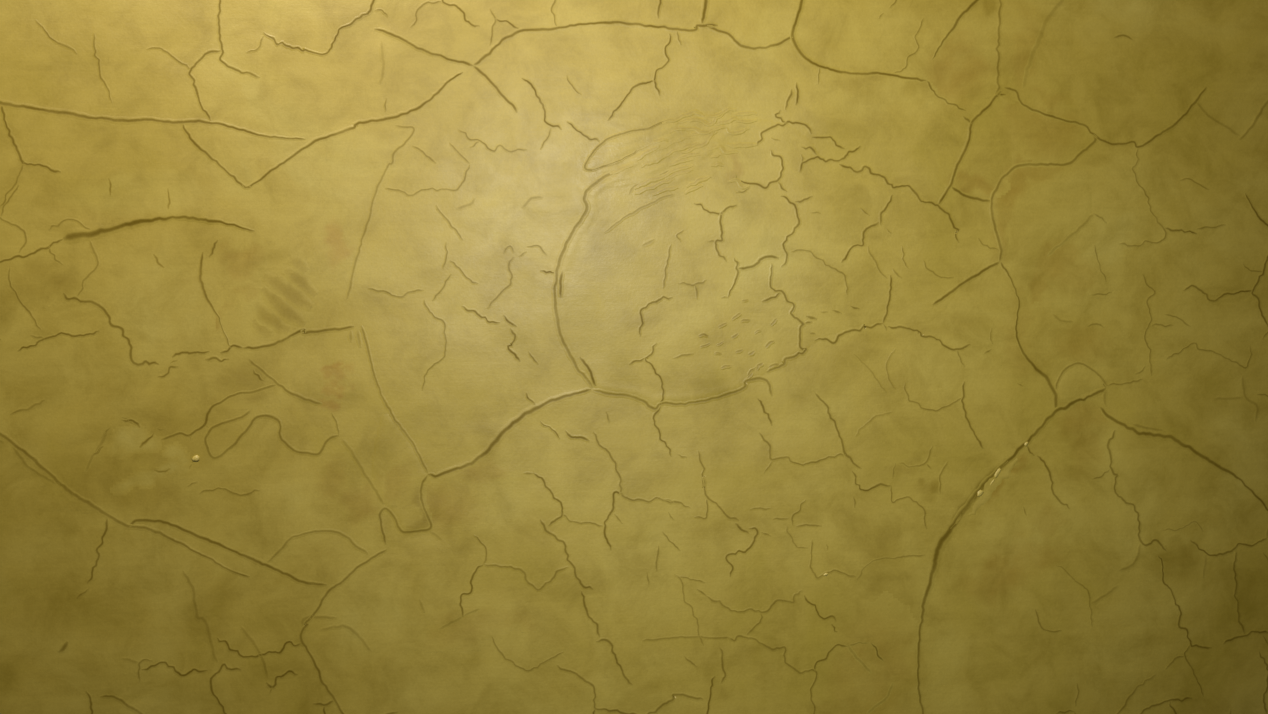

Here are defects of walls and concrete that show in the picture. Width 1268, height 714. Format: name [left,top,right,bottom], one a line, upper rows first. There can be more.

crack [0,0,1268,456]
crack [154,464,260,497]
crack [427,229,1268,714]
crack [76,518,110,599]
crack [121,570,301,714]